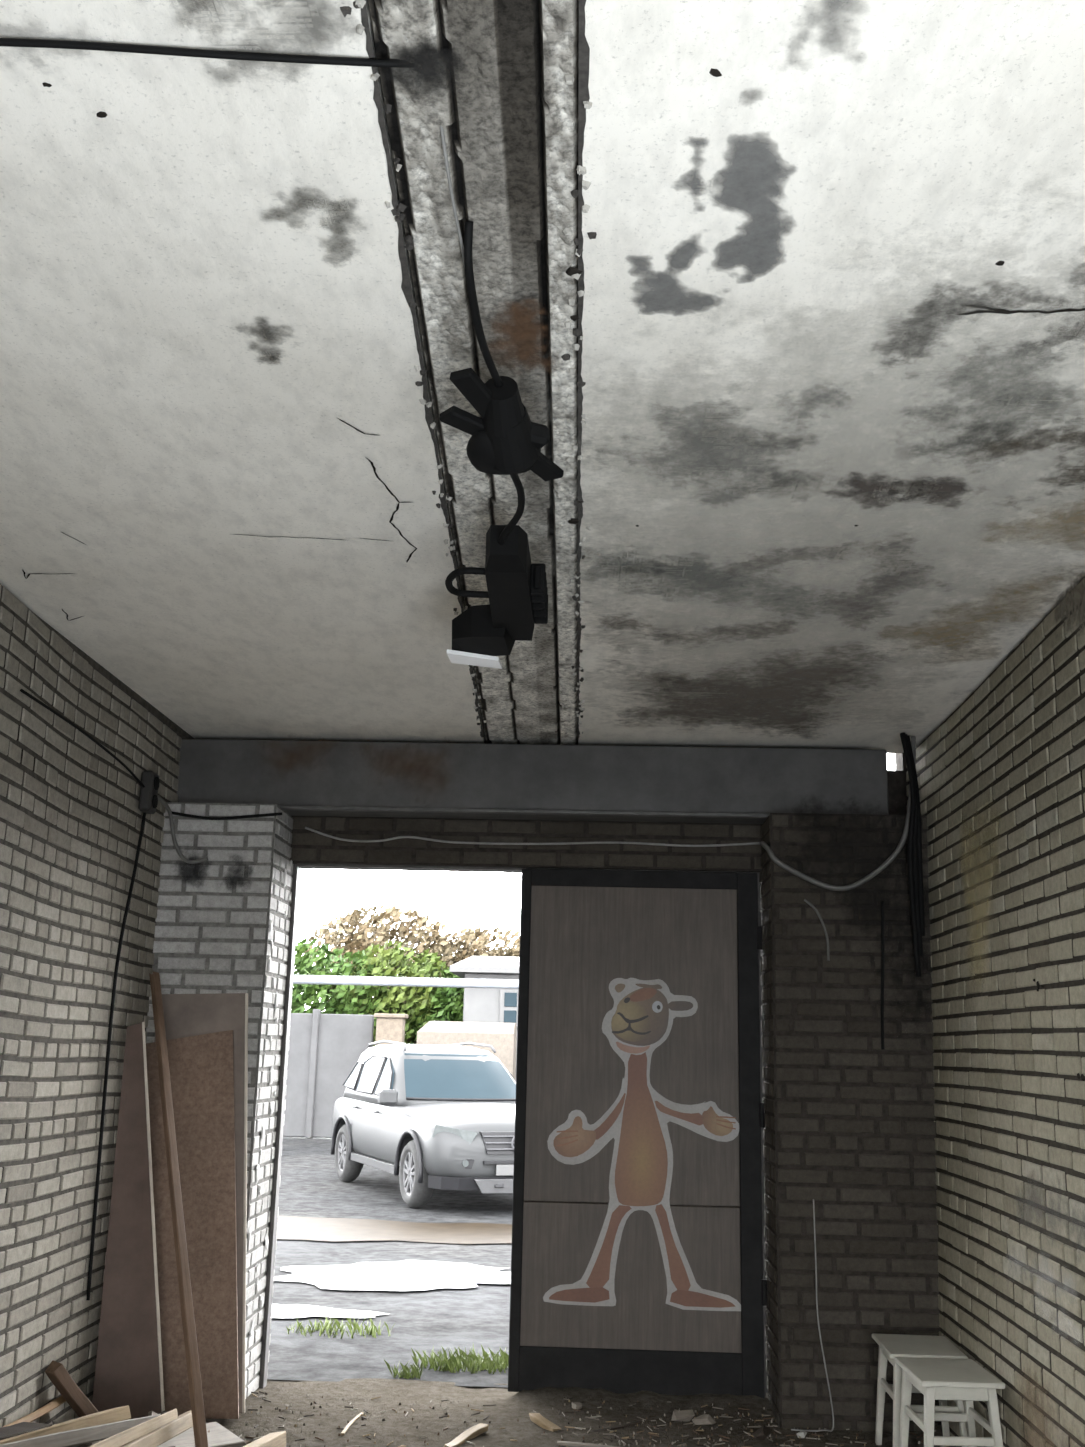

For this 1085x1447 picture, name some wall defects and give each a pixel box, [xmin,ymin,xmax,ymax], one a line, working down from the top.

water stain [226,43,273,79]
water stain [276,0,332,72]
water stain [265,192,353,259]
water stain [251,319,281,362]
crack [957,307,1085,315]
crack [235,418,417,562]
water stain [827,473,967,507]
water stain [627,646,866,737]